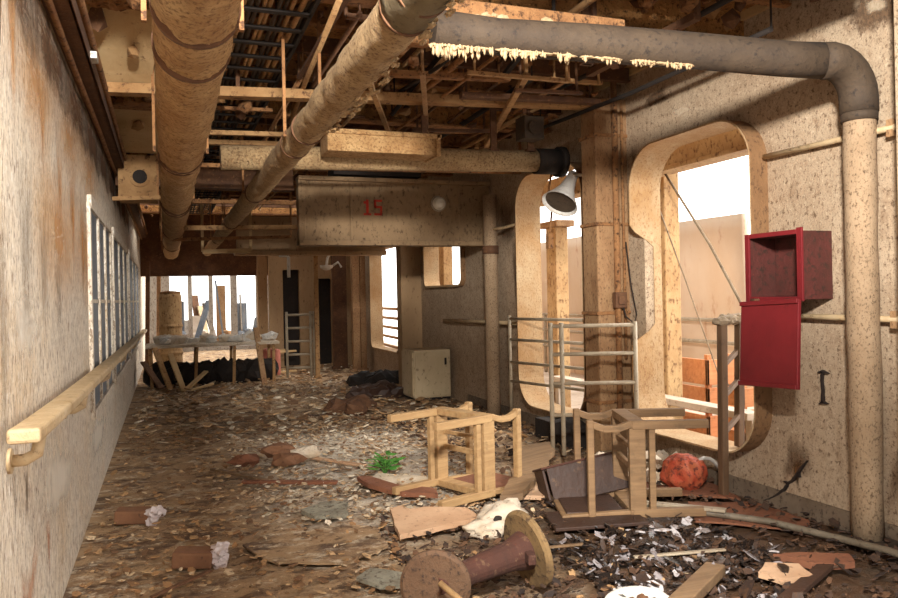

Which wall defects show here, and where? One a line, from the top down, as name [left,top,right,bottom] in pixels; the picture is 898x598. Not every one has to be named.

peeling [418,0,695,70]
damp [14,0,129,231]
peeling [324,57,400,135]
peeling [647,88,666,107]